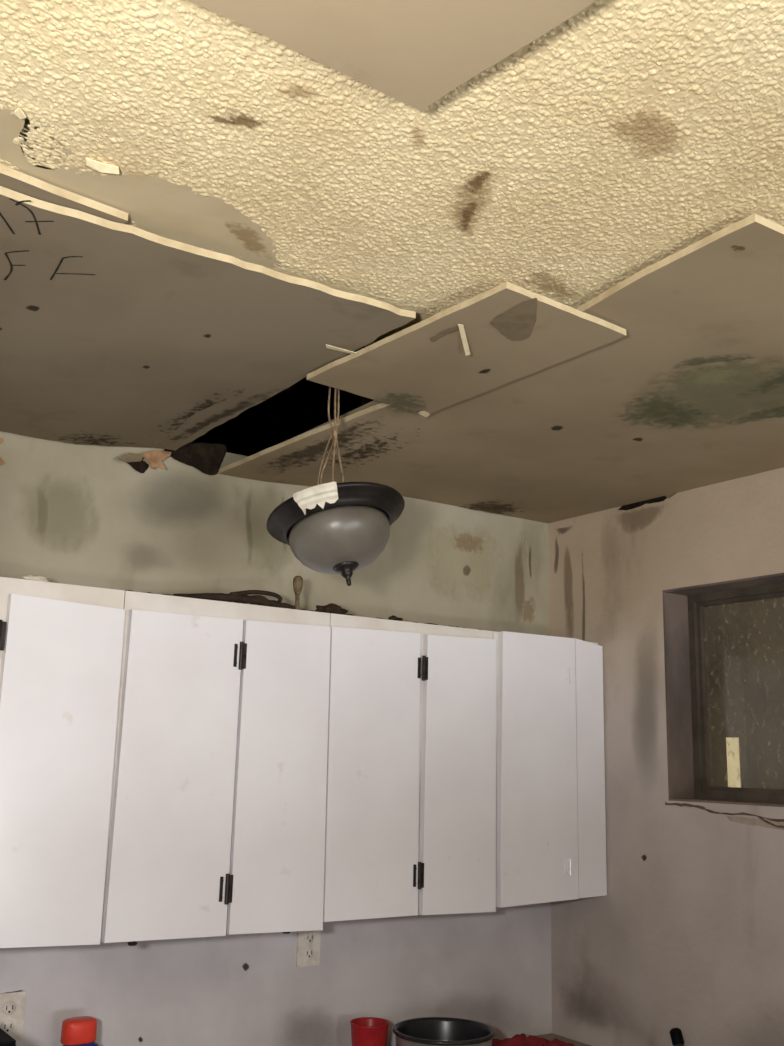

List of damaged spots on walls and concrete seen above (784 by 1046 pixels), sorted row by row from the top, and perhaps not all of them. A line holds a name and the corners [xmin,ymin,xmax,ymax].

crack [665,802,784,830]